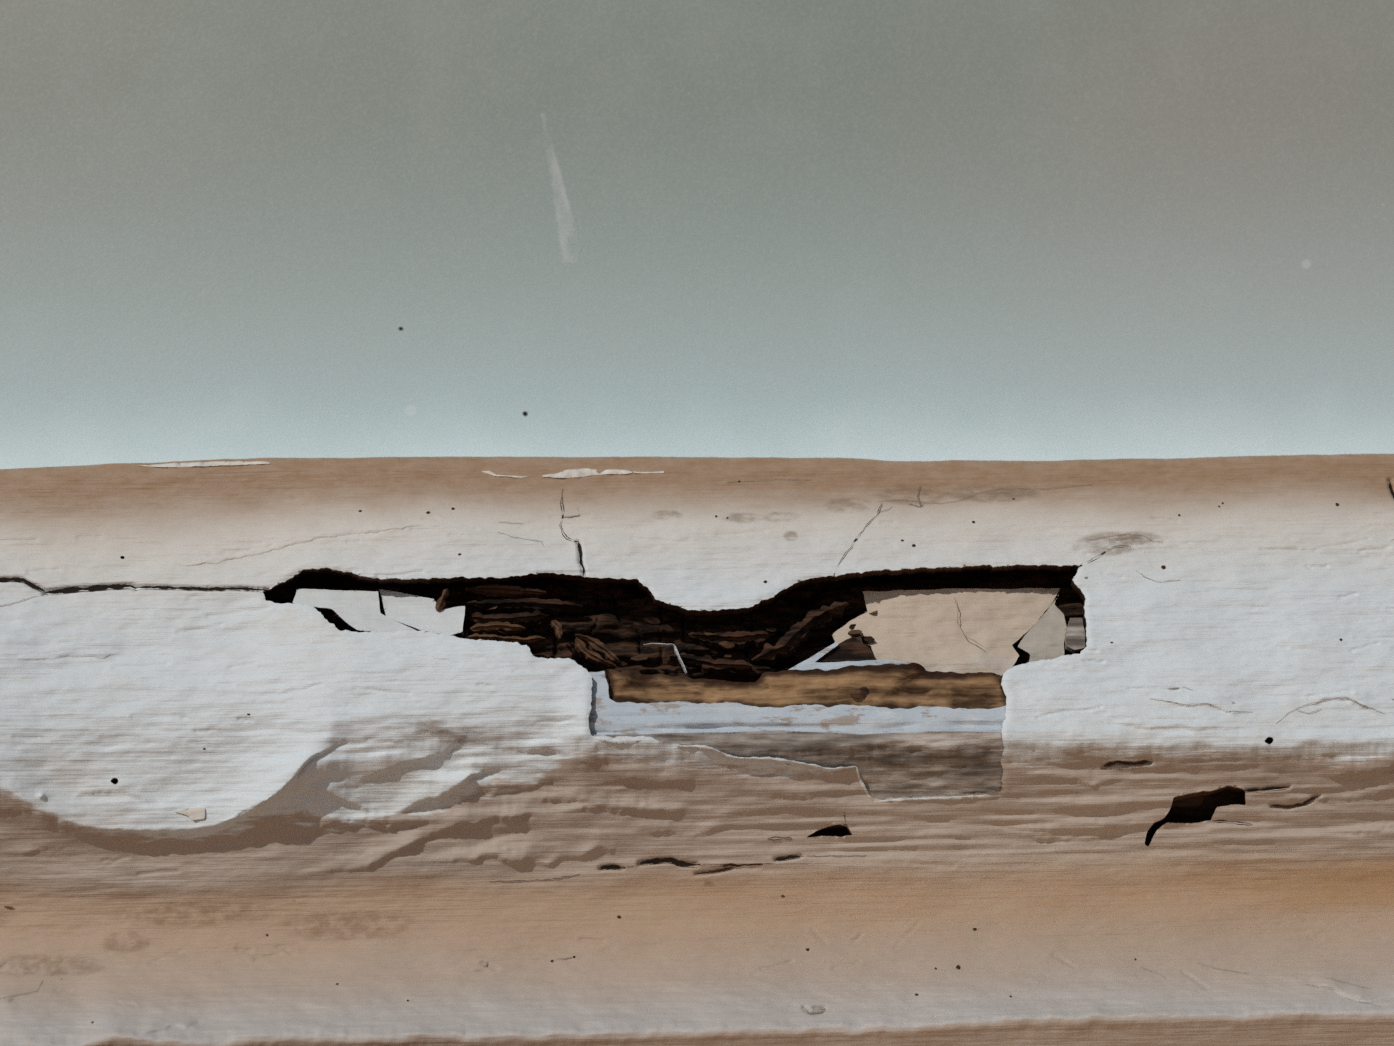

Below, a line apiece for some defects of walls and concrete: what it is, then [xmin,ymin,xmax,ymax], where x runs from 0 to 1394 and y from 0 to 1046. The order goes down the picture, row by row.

crack [498,489,585,577]
crack [0,577,264,606]
peeling [293,589,465,636]
peeling [789,588,1067,676]
peeling [588,671,1006,802]